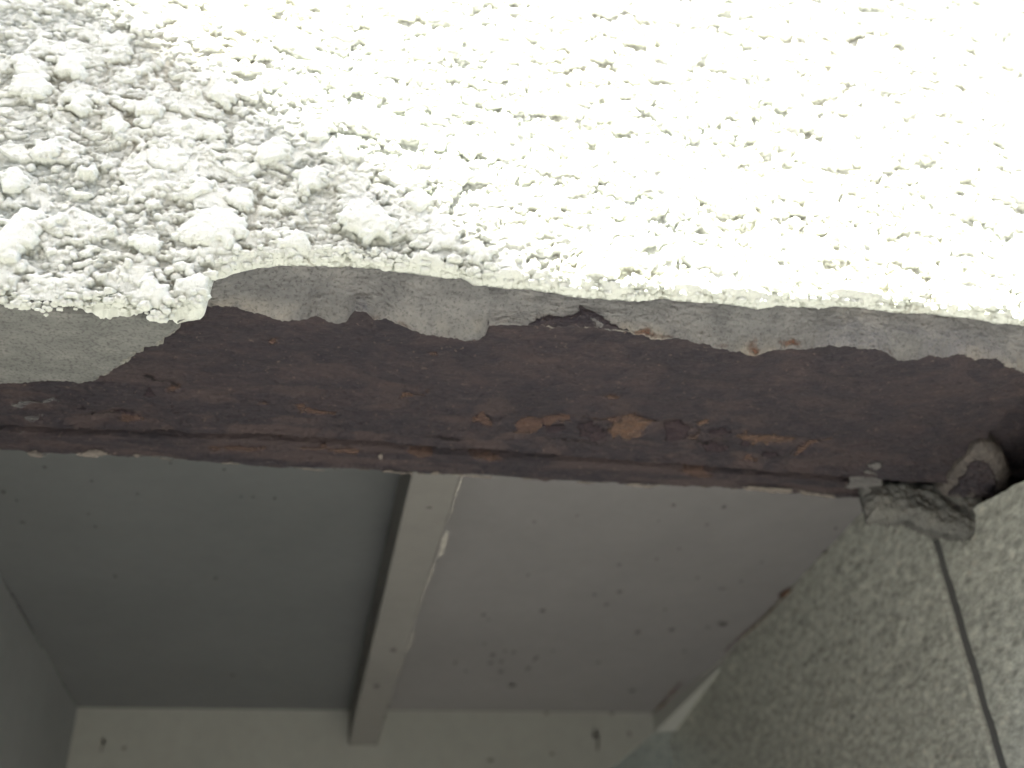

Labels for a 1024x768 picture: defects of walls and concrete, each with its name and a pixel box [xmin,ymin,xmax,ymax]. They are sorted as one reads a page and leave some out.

spalling [207,266,1024,373]
corrosion [514,414,570,434]
corrosion [593,414,657,440]
peeling [76,449,107,458]
peeling [359,454,499,516]
peeling [724,462,882,499]
corrosion [930,434,1011,499]